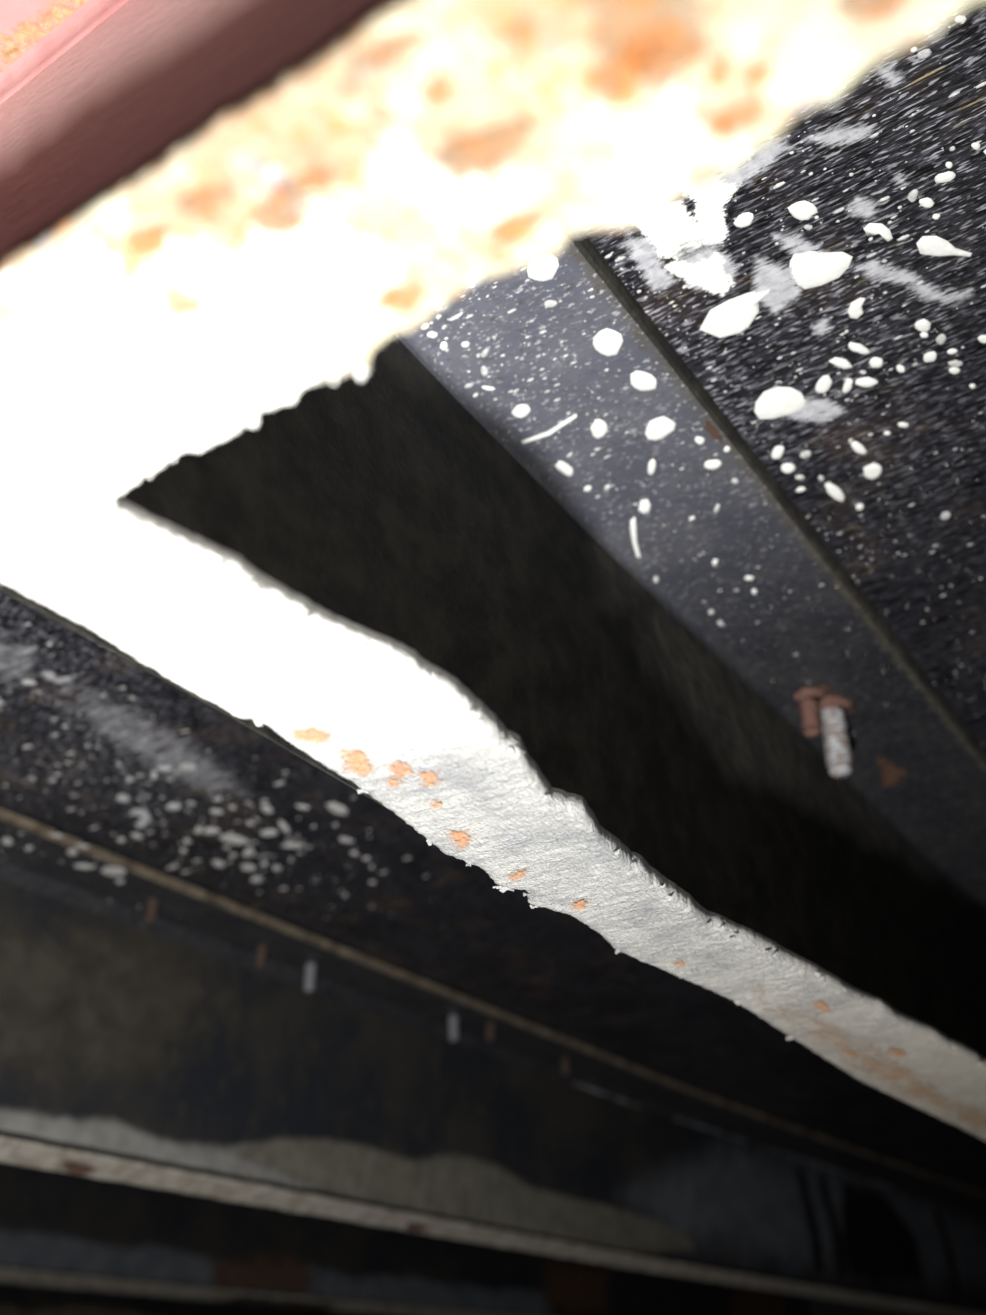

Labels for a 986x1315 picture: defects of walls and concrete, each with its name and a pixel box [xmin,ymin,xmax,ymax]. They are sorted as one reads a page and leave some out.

corrosion [0,0,86,71]
corrosion [842,0,909,21]
corrosion [348,34,425,92]
corrosion [593,0,771,137]
corrosion [437,123,530,177]
corrosion [251,173,332,236]
corrosion [123,228,168,259]
corrosion [489,217,538,246]
corrosion [375,285,425,314]
corrosion [291,726,371,777]
corrosion [384,762,442,809]
corrosion [446,830,474,849]